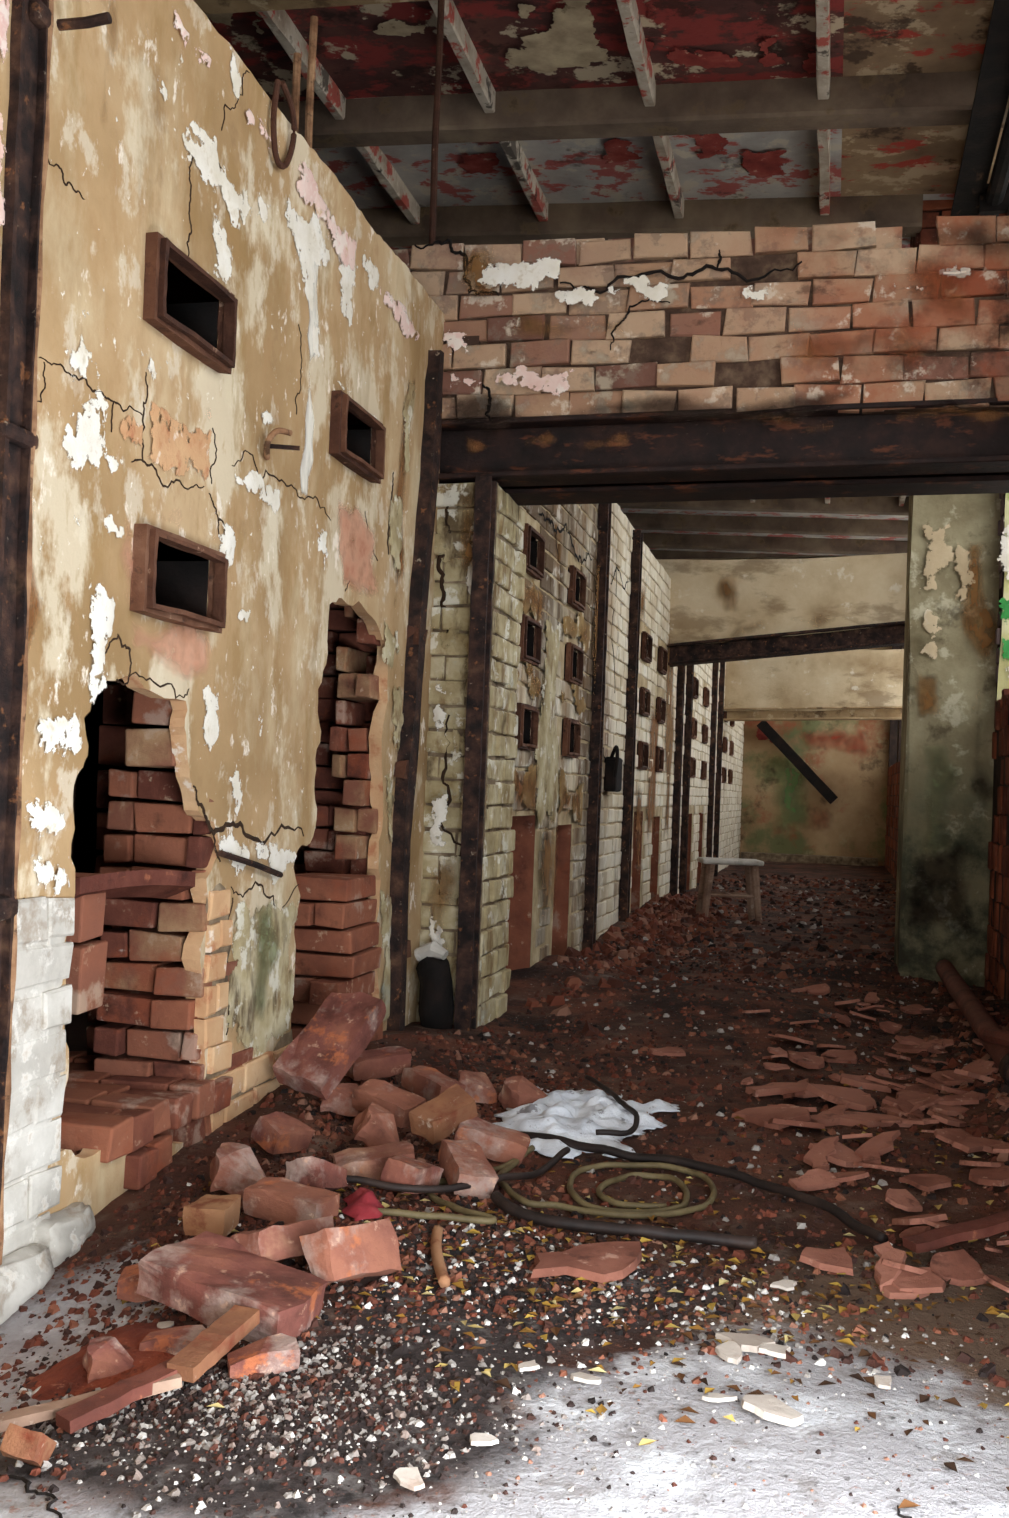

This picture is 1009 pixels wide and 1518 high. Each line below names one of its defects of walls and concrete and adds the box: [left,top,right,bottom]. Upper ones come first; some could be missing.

peeling [505,0,612,73]
peeling [477,257,668,307]
crack [560,250,802,350]
crack [37,357,394,592]
damp [964,546,997,656]
peeling [37,713,82,757]
damp [920,680,936,713]
spalling [89,583,305,1132]
crack [193,785,304,920]
spalling [333,598,404,1022]
damp [911,751,965,927]
crack [0,1474,63,1518]